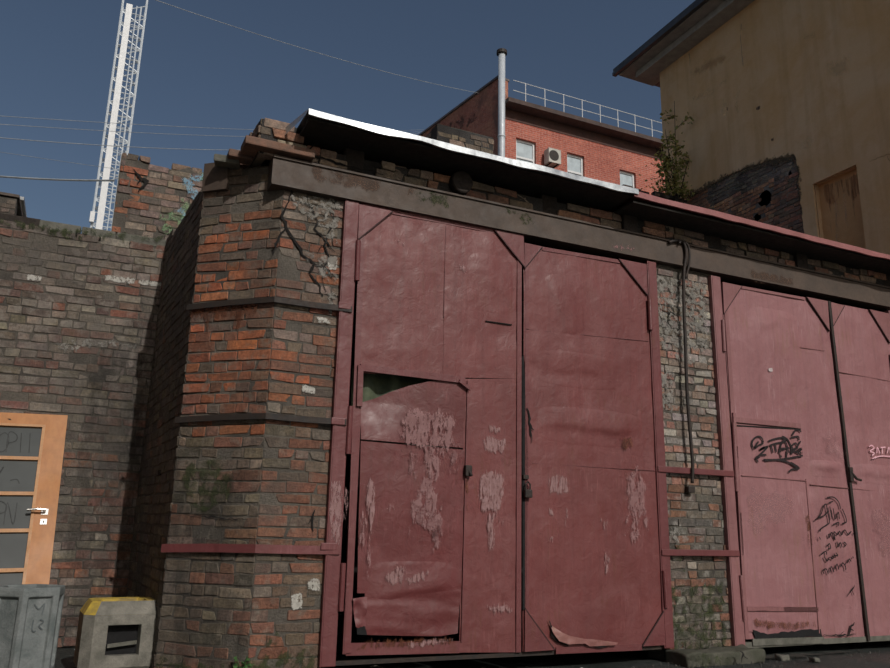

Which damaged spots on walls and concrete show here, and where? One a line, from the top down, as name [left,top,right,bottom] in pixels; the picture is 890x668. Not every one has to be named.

crack [273,190,335,296]
peeling [483,425,507,454]
peeling [329,481,349,545]
peeling [402,408,460,553]
peeling [478,469,504,550]
peeling [624,465,652,544]